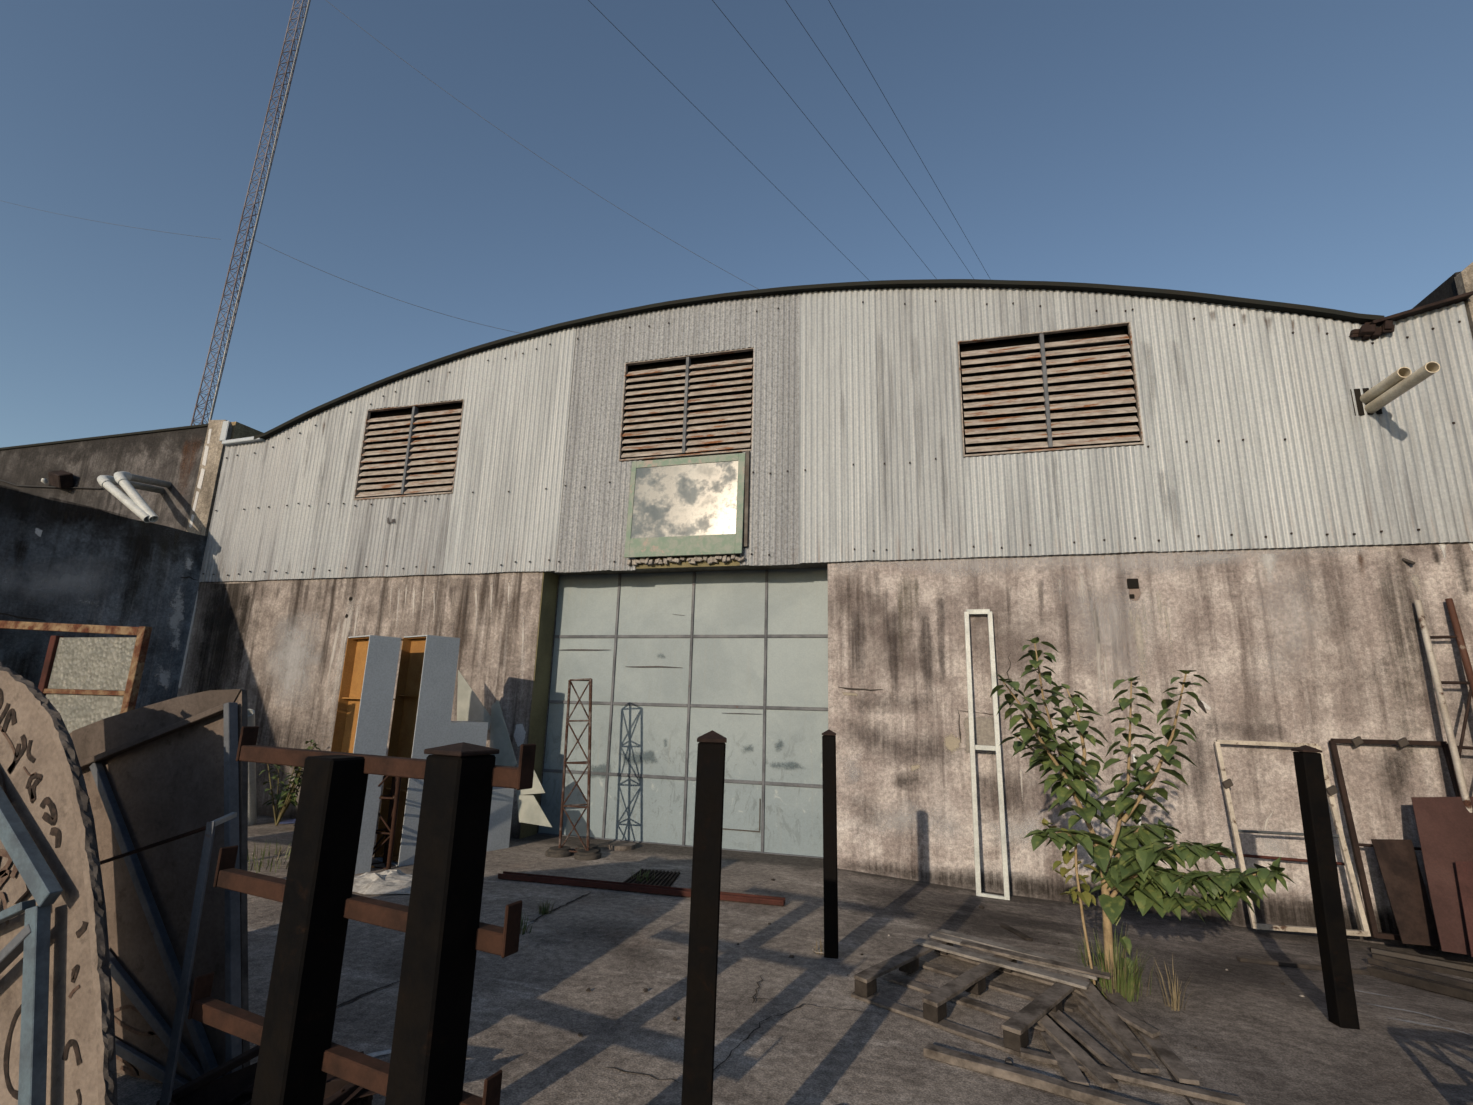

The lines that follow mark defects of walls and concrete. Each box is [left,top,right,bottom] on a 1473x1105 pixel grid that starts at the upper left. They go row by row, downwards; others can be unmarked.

damp [0,485,151,586]
damp [197,583,248,693]
damp [328,608,358,701]
damp [390,587,435,617]
crack [714,974,882,1070]
crack [607,1067,680,1083]